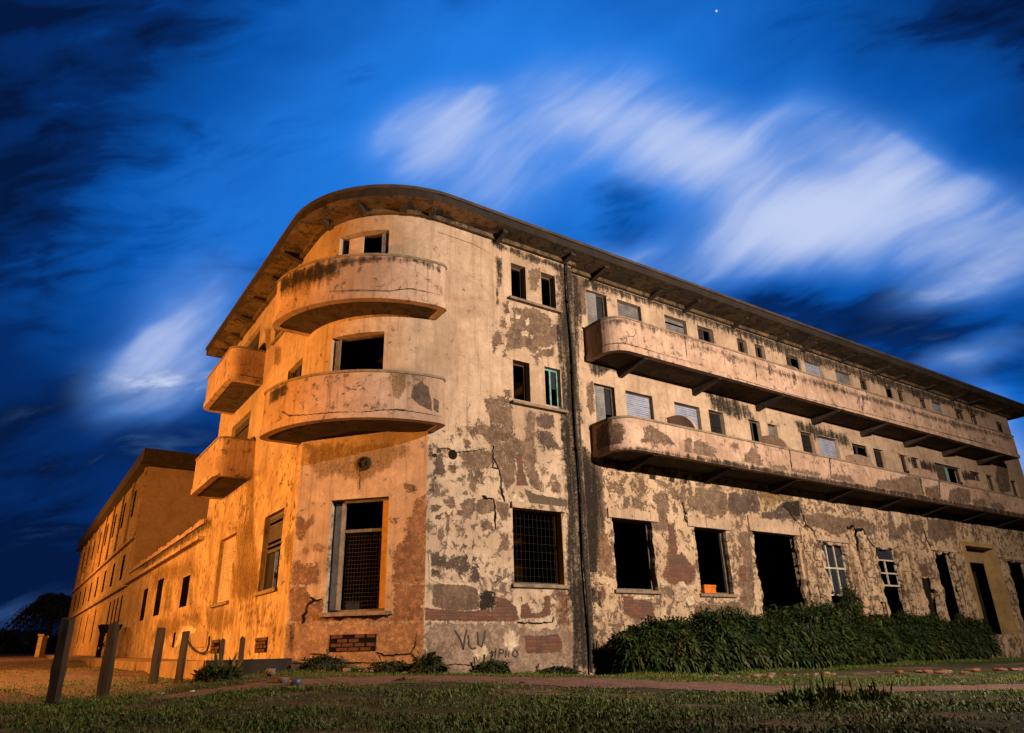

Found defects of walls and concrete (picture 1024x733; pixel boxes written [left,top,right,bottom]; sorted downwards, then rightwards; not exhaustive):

peeling [491,301,560,366]
peeling [411,381,439,413]
peeling [284,388,576,675]
crack [438,446,505,529]
leakage [491,240,1024,673]
flaking render [583,381,974,621]
crack [847,525,875,567]
peeling [876,463,1011,510]
crack [302,597,394,623]